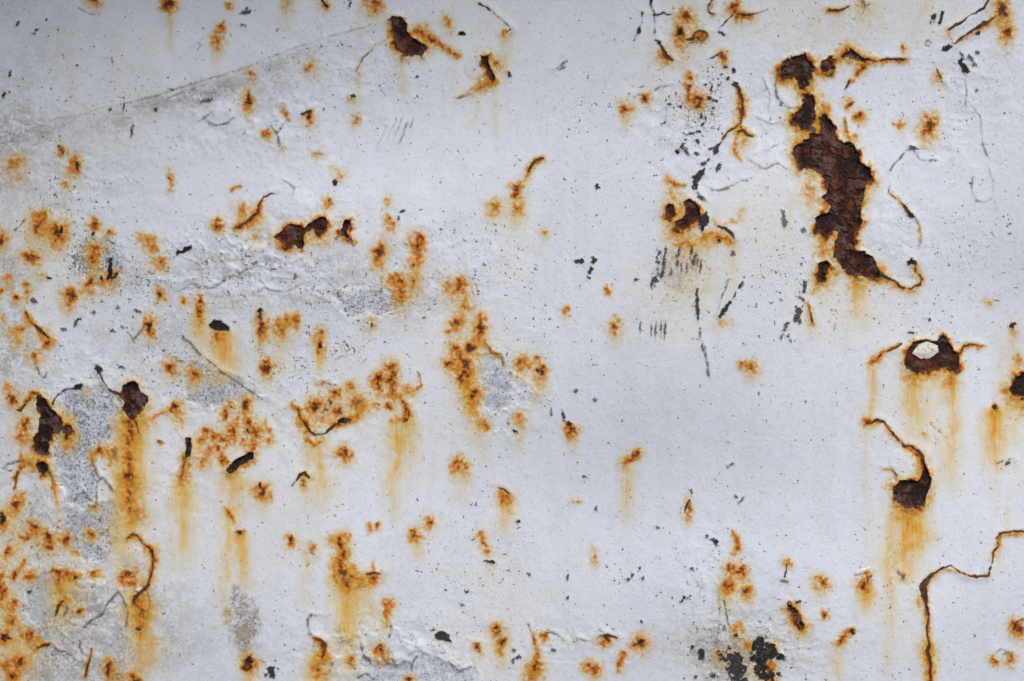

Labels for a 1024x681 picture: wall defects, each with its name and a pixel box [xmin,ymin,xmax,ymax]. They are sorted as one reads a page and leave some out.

corrosion [348,0,462,71]
corrosion [274,197,357,253]
corrosion [661,175,743,256]
corrosion [773,43,925,326]
corrosion [0,382,101,681]
corrosion [89,364,186,529]
corrosion [176,394,274,565]
corrosion [290,359,423,490]
corrosion [441,275,549,434]
corrosion [862,417,934,581]
corrosion [867,331,985,415]
crack [917,530,1024,681]